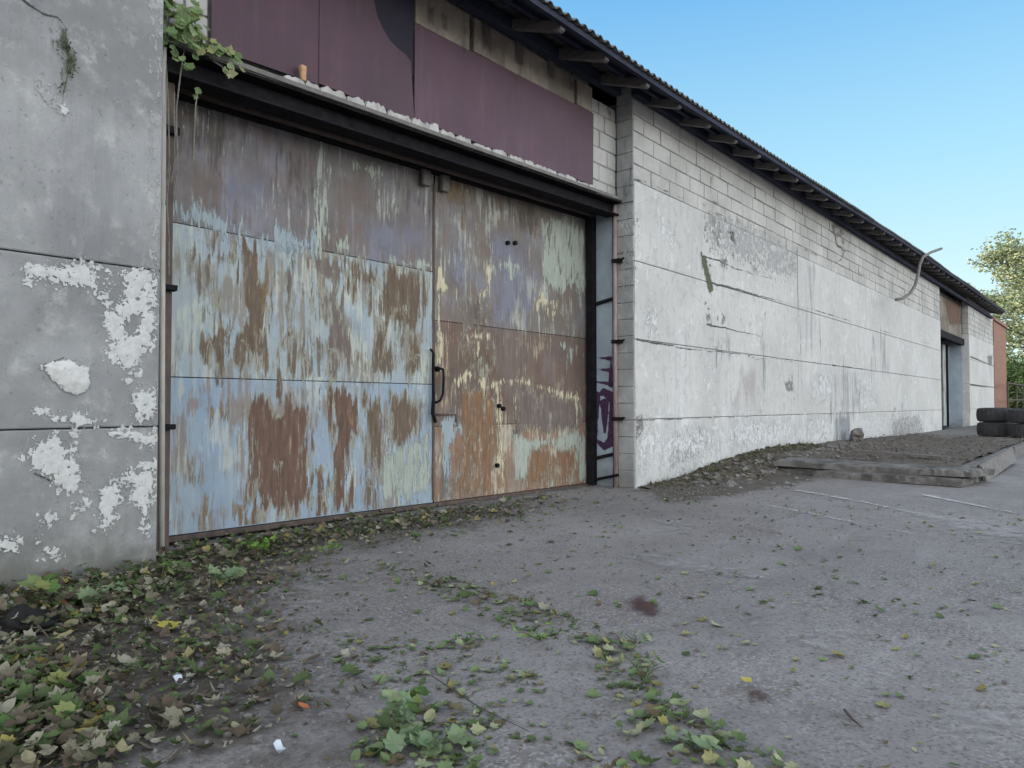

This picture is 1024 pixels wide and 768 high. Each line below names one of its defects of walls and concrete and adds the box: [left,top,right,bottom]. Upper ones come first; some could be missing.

crack [22,0,68,30]
peeling [0,177,161,563]
rust [185,218,428,531]
rust [435,340,498,501]
rust [513,386,585,490]